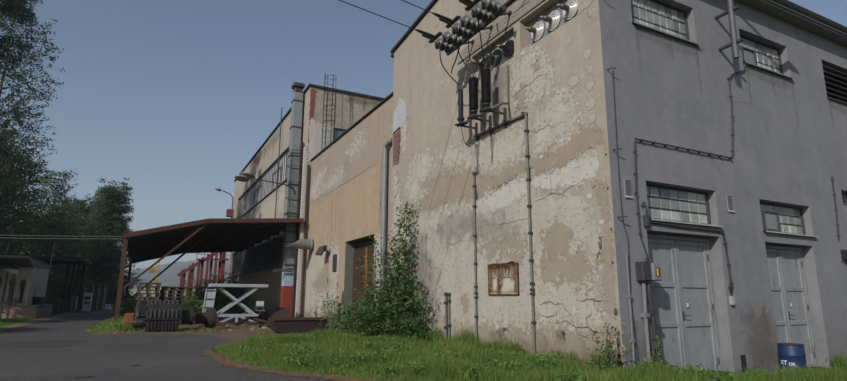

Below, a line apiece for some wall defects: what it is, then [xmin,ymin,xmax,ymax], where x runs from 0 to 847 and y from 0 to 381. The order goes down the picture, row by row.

peeling [304,39,630,370]
corrosion [488,262,517,294]
crack [539,298,616,343]